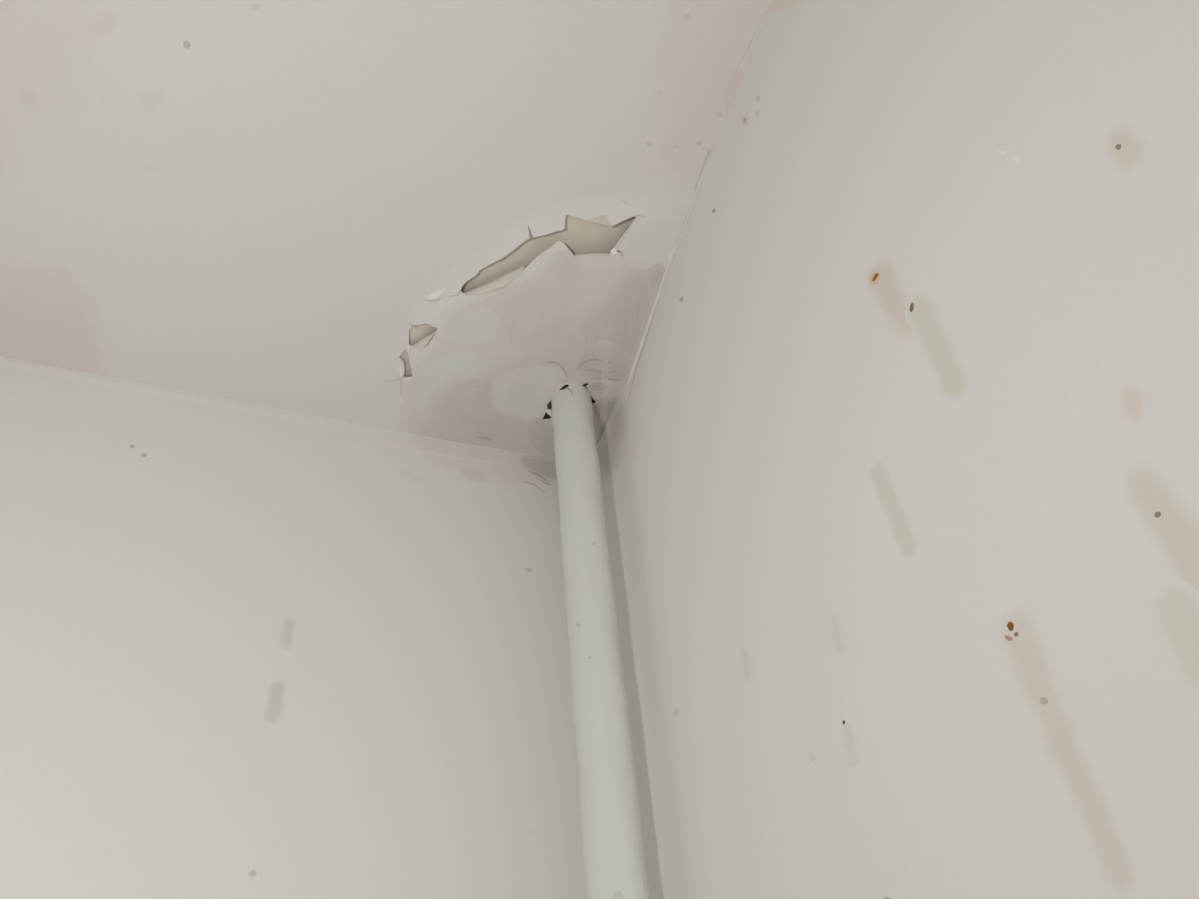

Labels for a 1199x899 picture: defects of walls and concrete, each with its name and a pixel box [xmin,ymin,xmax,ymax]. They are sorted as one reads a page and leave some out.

peeling [382,188,695,431]
corrosion [868,270,881,286]
corrosion [995,605,1140,899]